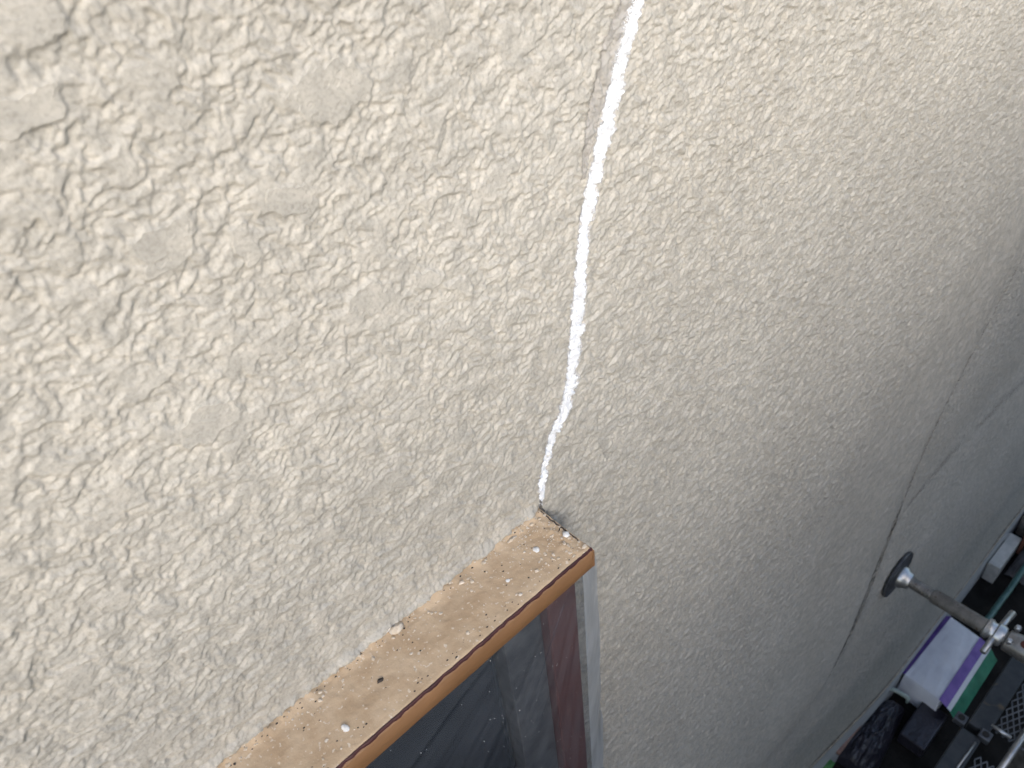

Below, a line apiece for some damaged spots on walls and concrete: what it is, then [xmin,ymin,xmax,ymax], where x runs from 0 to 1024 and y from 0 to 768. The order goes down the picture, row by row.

crack [538,0,644,541]